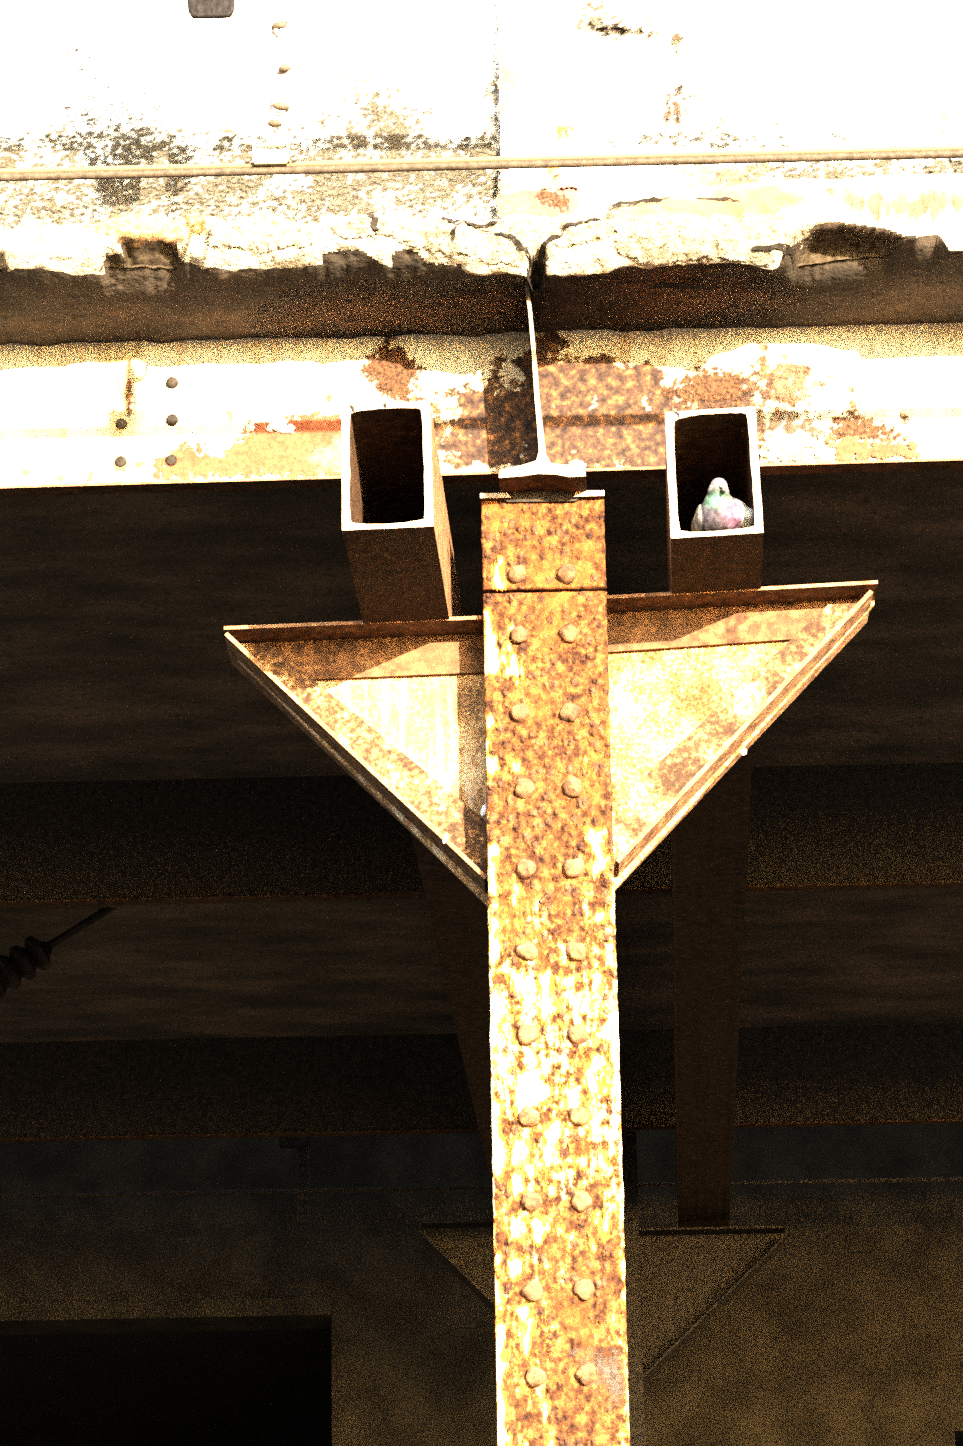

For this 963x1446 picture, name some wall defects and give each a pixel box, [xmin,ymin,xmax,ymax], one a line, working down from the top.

water stain [0,53,502,230]
corrosion [545,96,582,180]
spalling [0,247,12,271]
corrosion [83,211,213,246]
spalling [100,236,201,273]
spalling [206,169,933,295]
corrosion [619,183,808,219]
corrosion [358,346,423,401]
corrosion [662,349,906,446]
peeling [118,395,342,481]
corrosion [587,1350,627,1401]